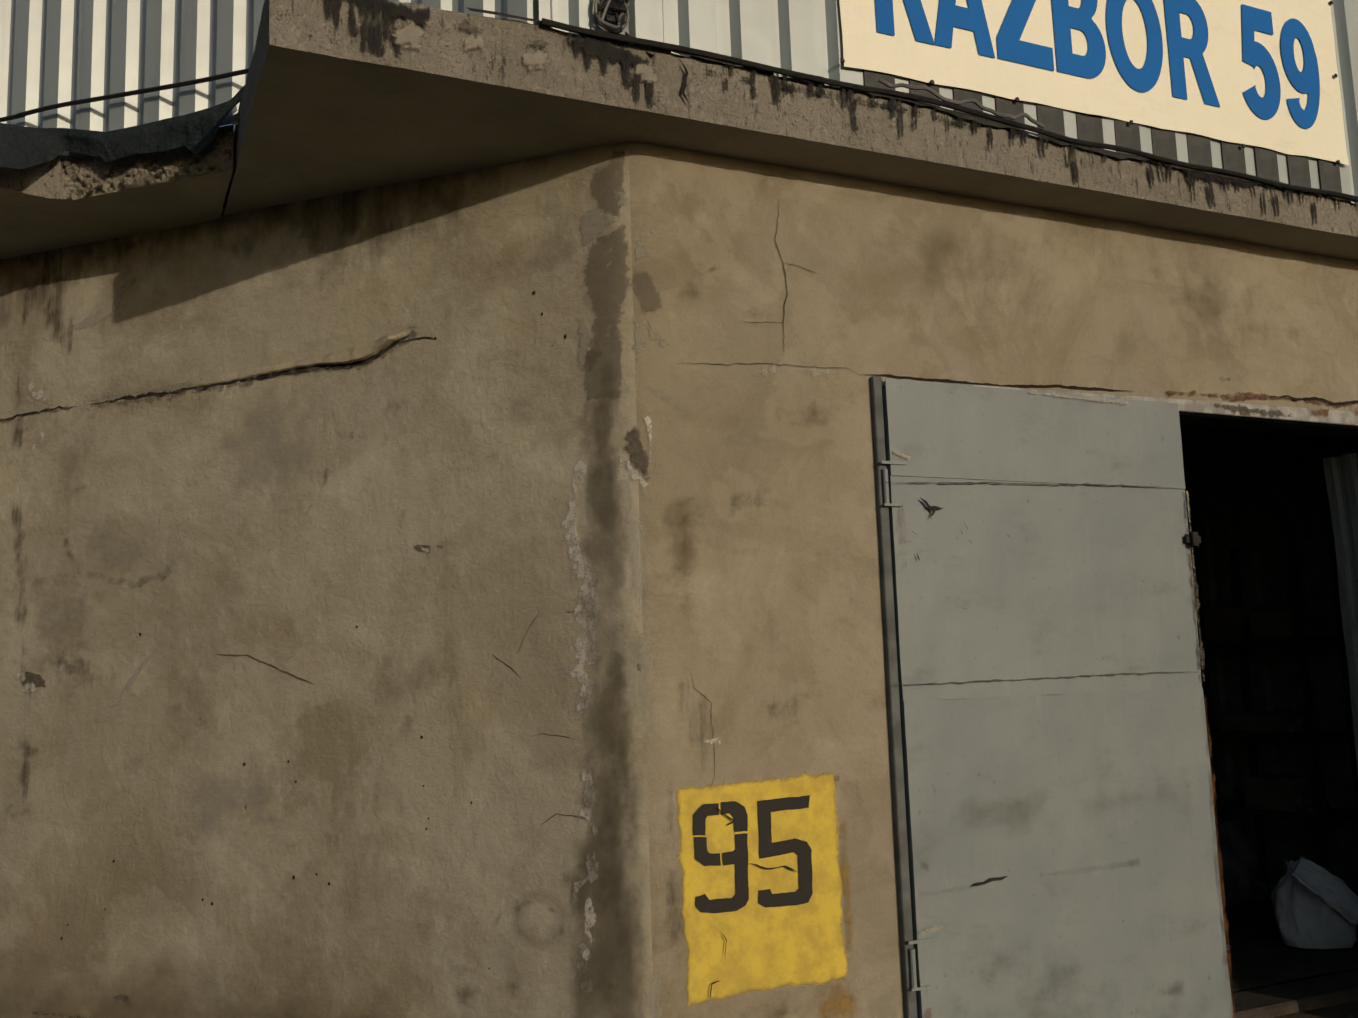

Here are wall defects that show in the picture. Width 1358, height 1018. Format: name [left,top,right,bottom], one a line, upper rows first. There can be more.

spalling [63,133,232,201]
crack [0,324,436,421]
leakage [619,416,652,487]
leakage [561,460,602,714]
leakage [572,852,599,993]